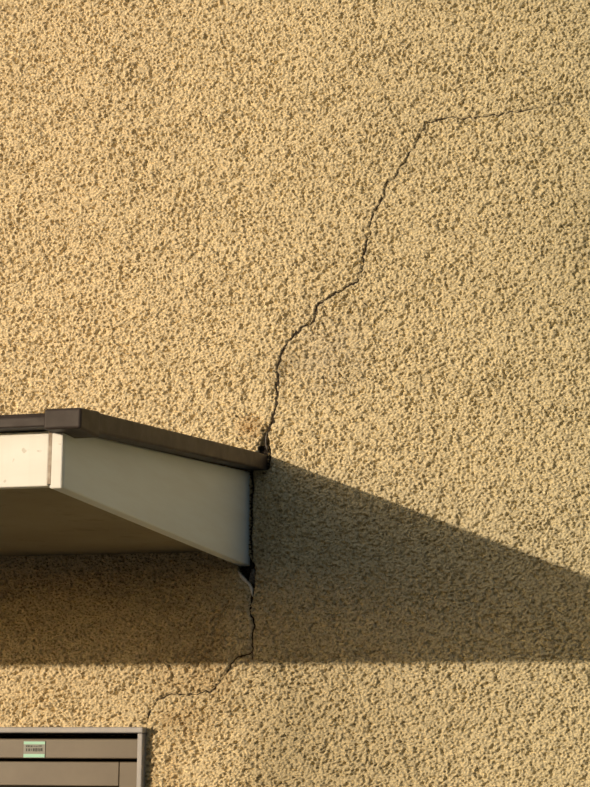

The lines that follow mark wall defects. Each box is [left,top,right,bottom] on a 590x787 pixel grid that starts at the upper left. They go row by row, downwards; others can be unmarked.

crack [267,102,573,432]
crack [144,595,256,724]